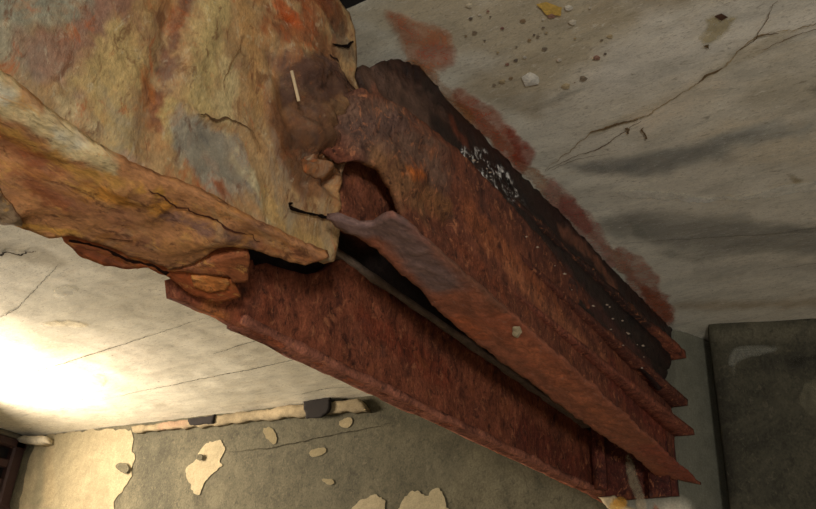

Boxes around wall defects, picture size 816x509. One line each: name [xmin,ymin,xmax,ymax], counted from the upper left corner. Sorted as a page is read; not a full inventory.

crack [545,3,816,171]
crack [198,113,261,153]
crack [149,190,260,242]
corrosion [442,93,674,323]
peeling [19,429,135,509]
peeling [185,440,225,495]
peeling [352,494,385,509]
peeling [399,488,449,509]